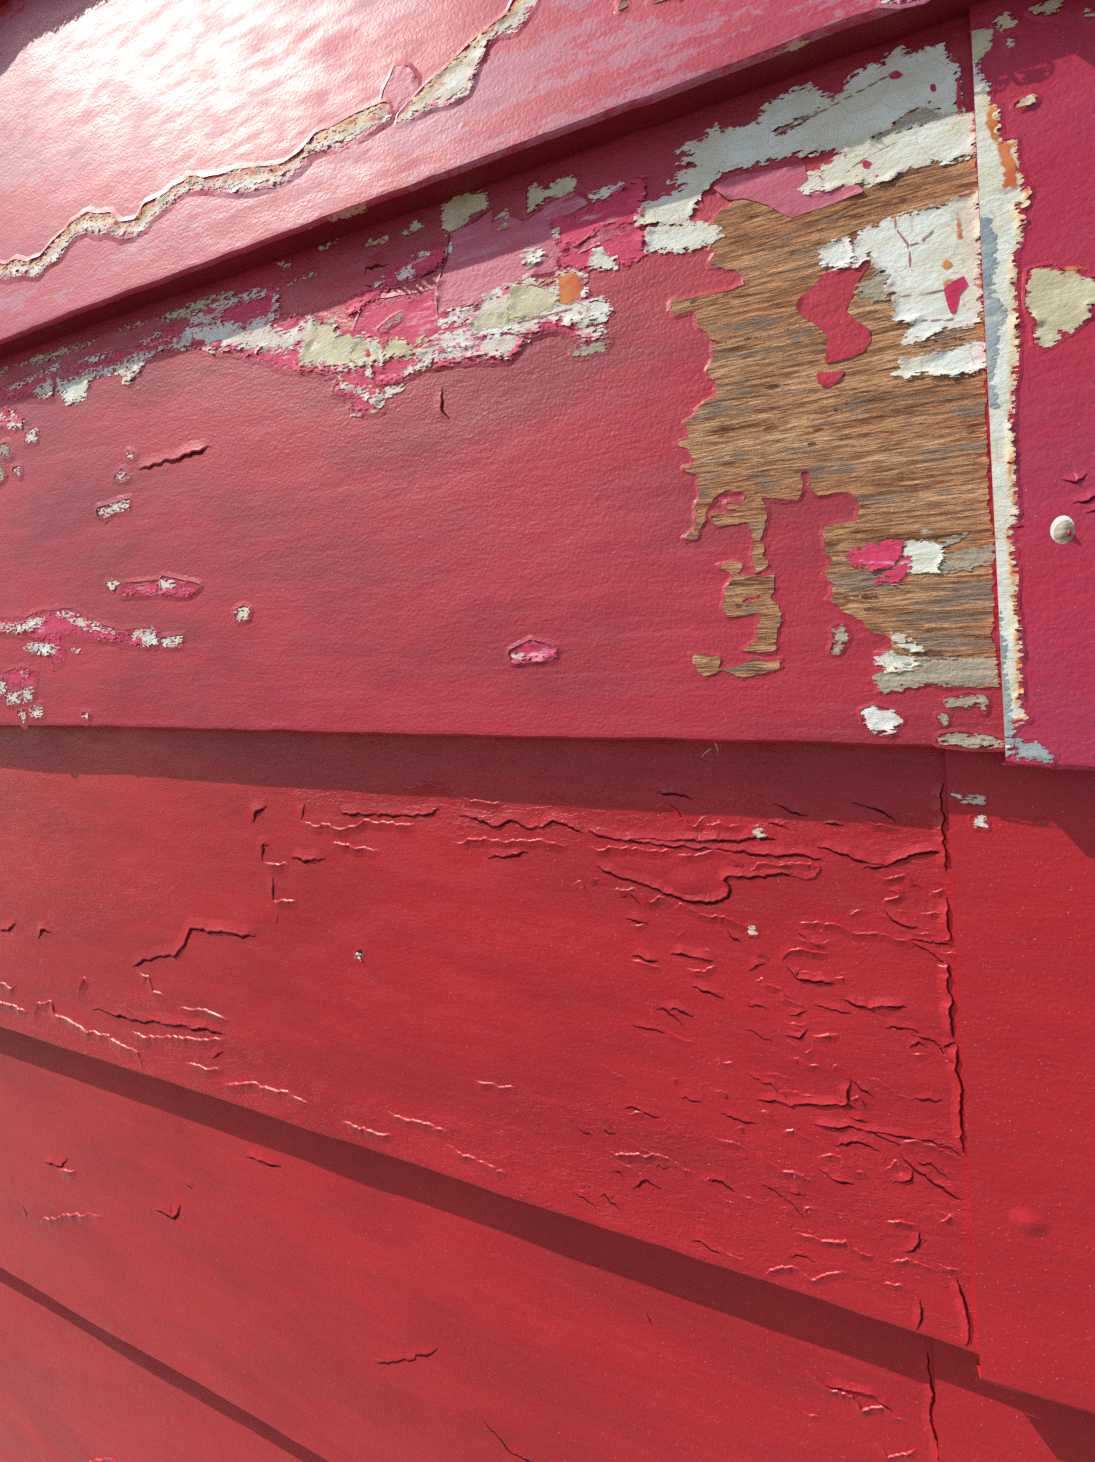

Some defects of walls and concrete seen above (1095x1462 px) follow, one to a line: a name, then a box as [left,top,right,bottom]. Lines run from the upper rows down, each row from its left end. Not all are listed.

peeling [0,0,1095,768]
peeling [750,823,770,842]
peeling [951,789,992,834]
peeling [745,921,762,939]
crack [0,782,970,1462]